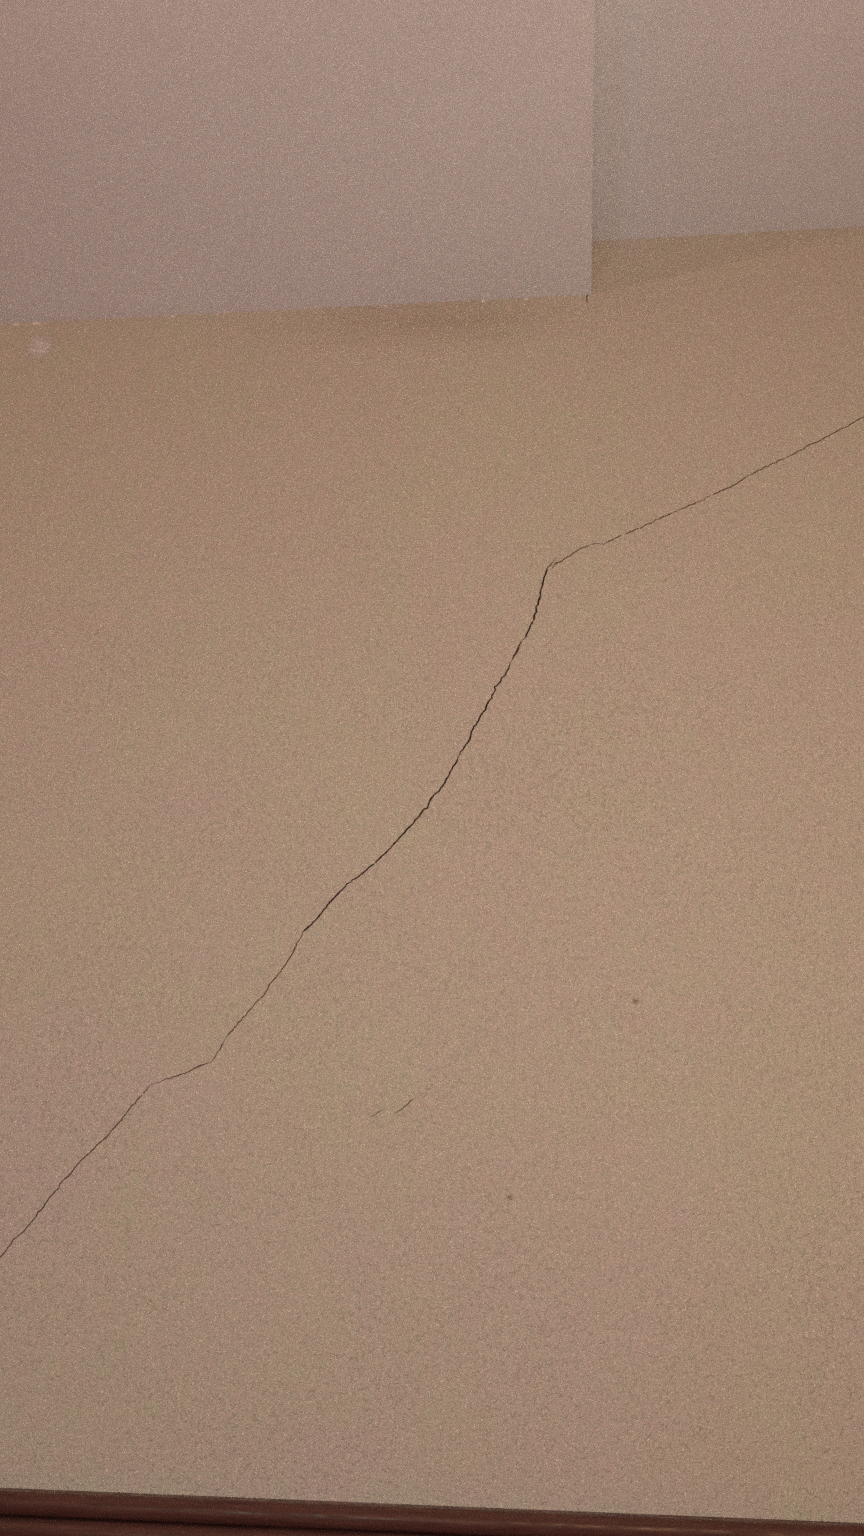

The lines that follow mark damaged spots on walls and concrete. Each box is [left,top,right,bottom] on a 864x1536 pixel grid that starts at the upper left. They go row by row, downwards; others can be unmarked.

crack [0,417,864,1257]